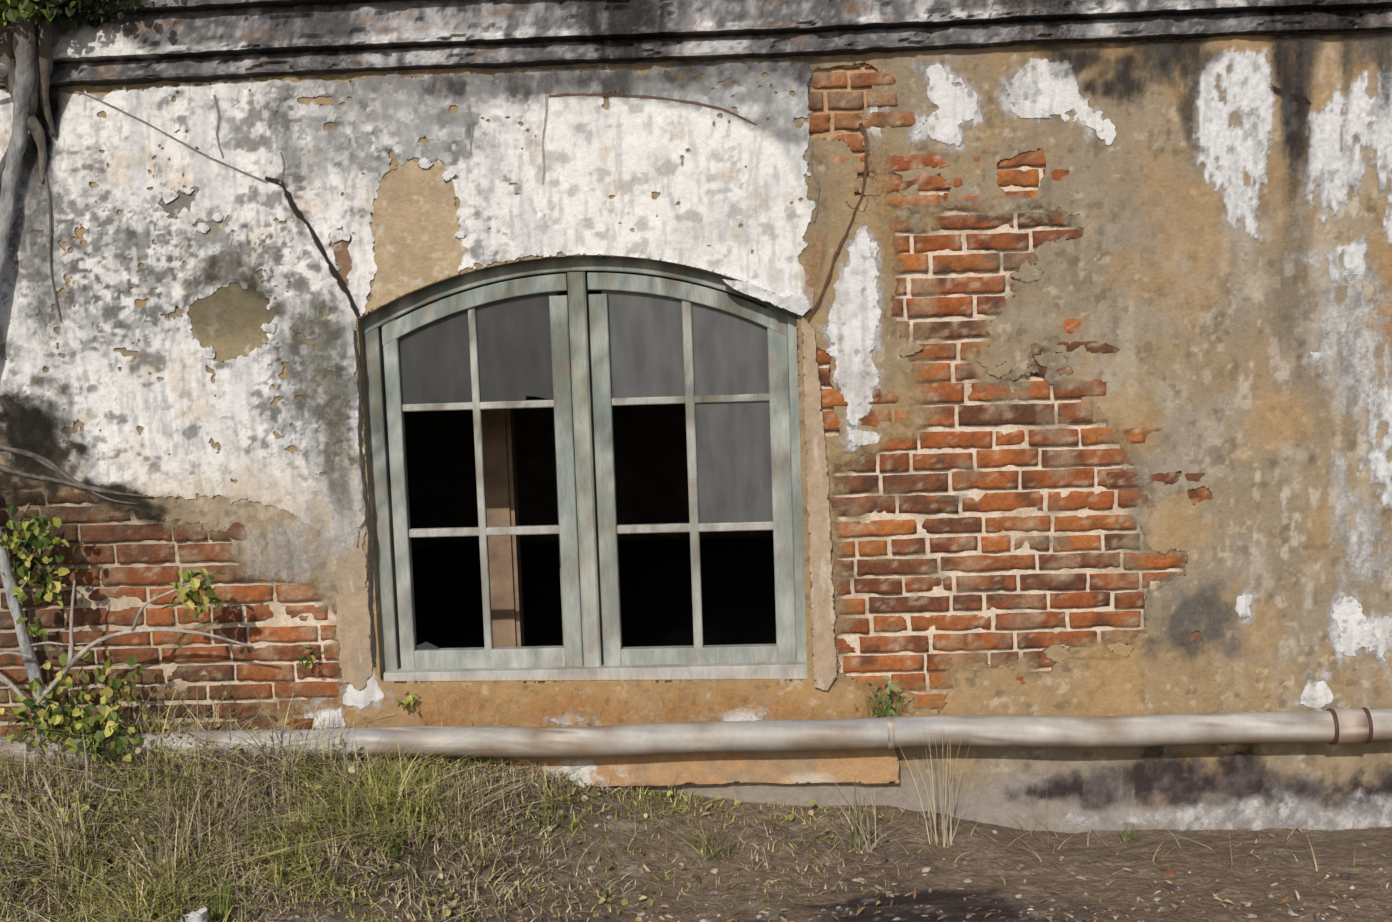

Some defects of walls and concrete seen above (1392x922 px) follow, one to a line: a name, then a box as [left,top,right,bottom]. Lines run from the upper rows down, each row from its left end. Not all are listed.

crack [466,103,474,155]
crack [542,93,756,184]
peeling [1191,47,1275,240]
peeling [1304,64,1392,244]
peeling [365,158,468,314]
crack [78,91,376,667]
peeling [187,282,278,365]
spalling [808,58,1213,717]
spalling [0,472,384,737]
leakage [1149,583,1237,657]
peeling [1295,591,1392,711]
leakage [1010,743,1392,831]